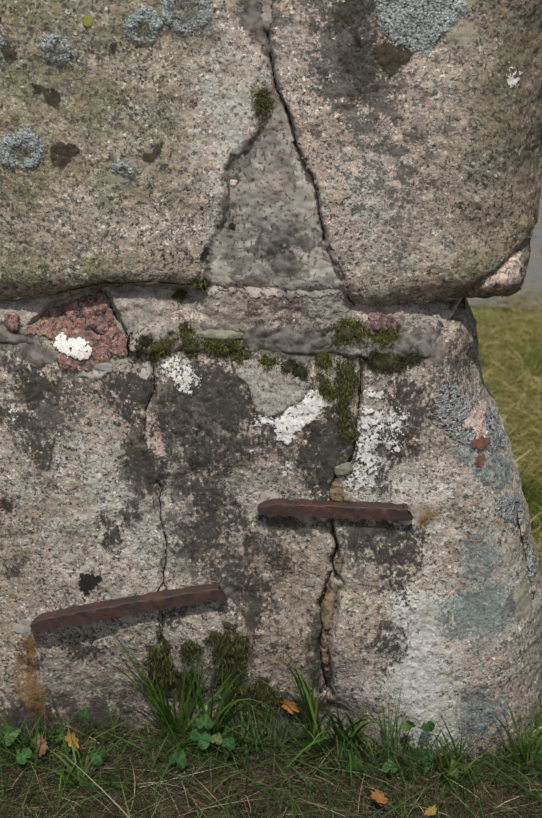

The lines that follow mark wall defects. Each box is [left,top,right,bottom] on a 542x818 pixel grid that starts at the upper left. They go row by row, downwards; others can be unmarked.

leakage [228,0,279,74]
crack [267,35,299,150]
leakage [325,0,414,103]
crack [350,369,362,463]
leakage [0,494,17,524]
leakage [3,555,26,581]
leakage [13,640,47,669]
leakage [59,629,117,663]
crack [148,482,167,592]
leakage [93,359,439,673]
crack [319,518,339,692]